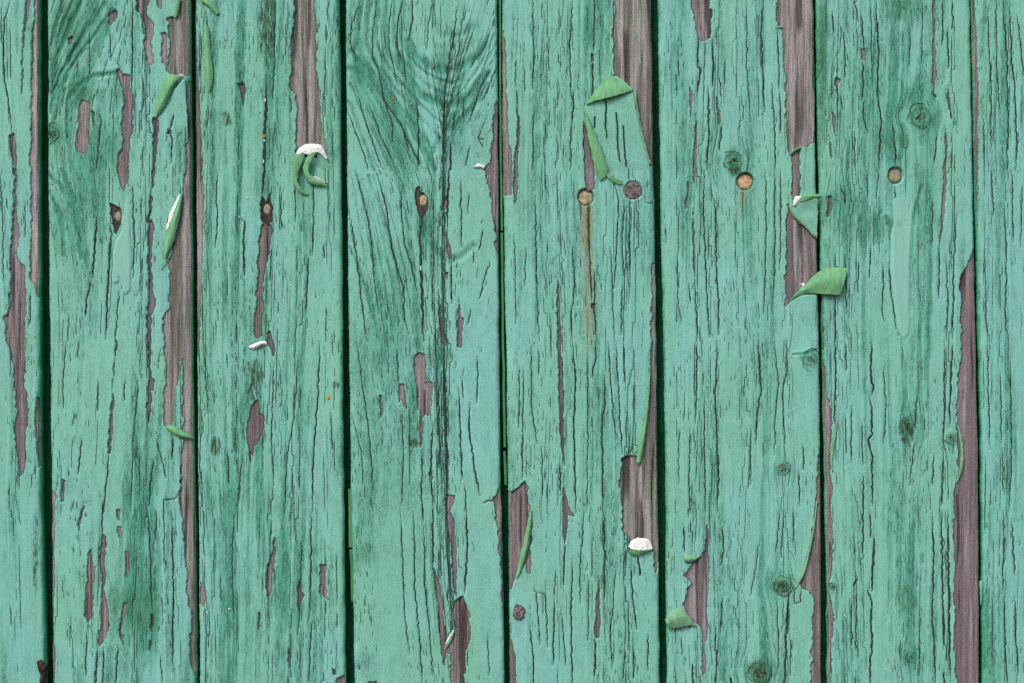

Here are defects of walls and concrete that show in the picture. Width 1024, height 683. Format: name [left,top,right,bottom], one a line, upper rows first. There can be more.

crack [1,3,23,148]
crack [0,169,28,305]
peeling [4,0,41,477]
peeling [136,0,219,676]
crack [7,0,496,683]
peeling [289,0,330,196]
peeling [493,481,533,603]
peeling [583,0,653,192]
peeling [619,263,659,573]
crack [508,0,1024,683]
peeling [776,0,847,683]
peeling [953,252,979,683]